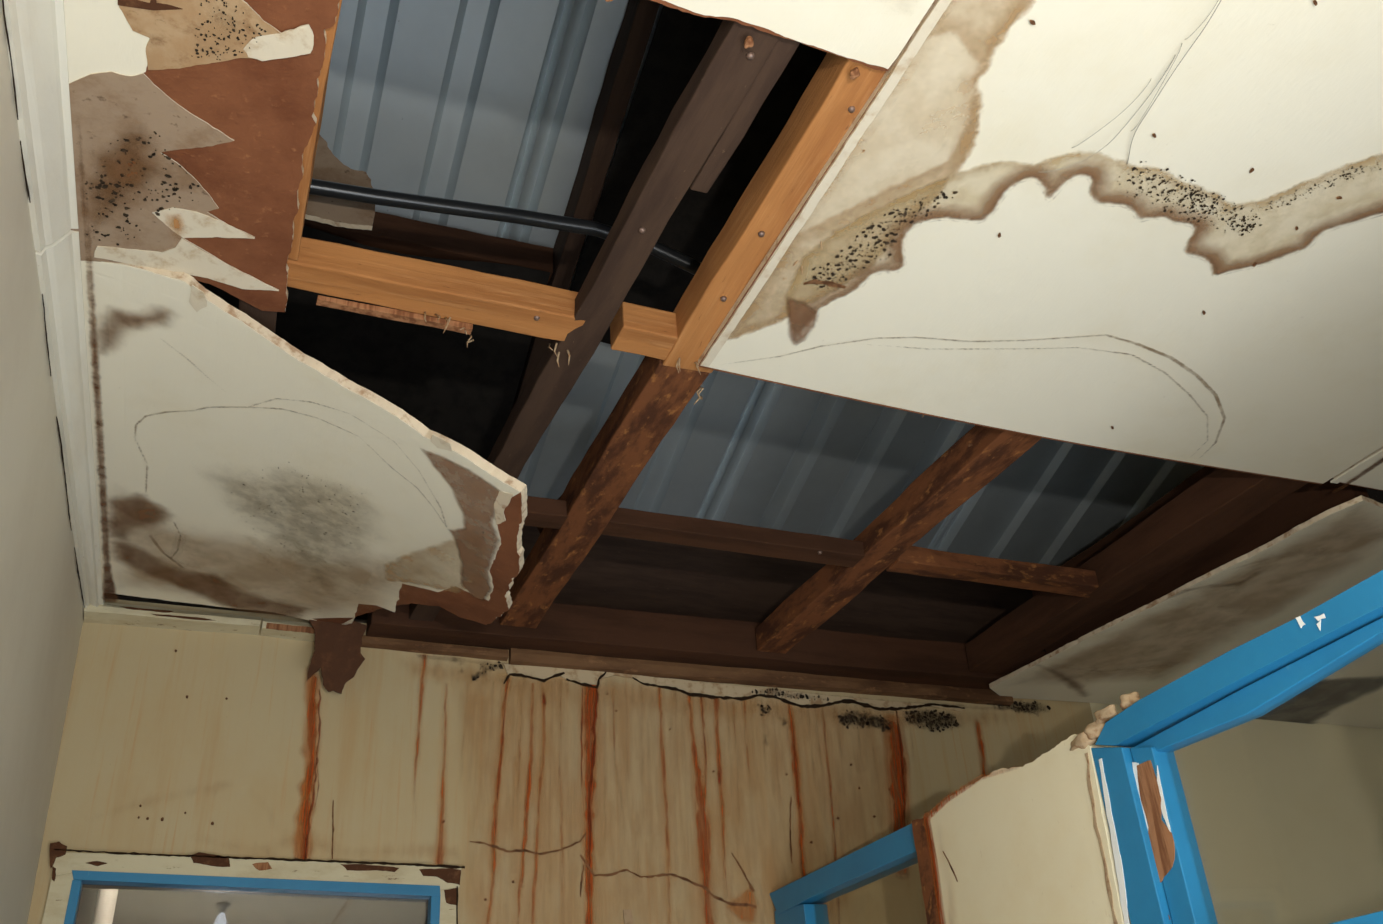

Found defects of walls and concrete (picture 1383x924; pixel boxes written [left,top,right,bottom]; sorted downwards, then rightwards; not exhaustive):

peeling [69,0,314,312]
damp [776,153,1383,343]
damp [88,260,302,617]
damp [387,453,499,601]
peeling [190,852,230,867]
rust [297,677,321,860]
crack [54,800,756,924]
peeling [419,868,461,905]
rust [581,684,598,924]
rust [688,696,724,924]
crack [503,672,965,711]
peeling [1132,760,1175,883]